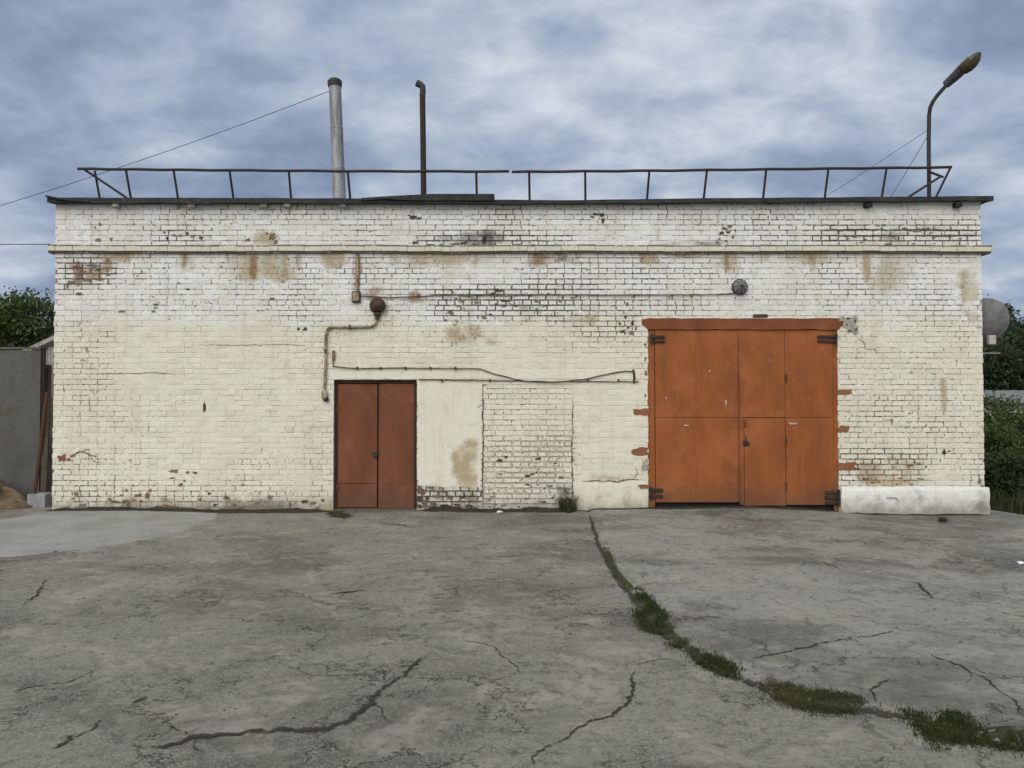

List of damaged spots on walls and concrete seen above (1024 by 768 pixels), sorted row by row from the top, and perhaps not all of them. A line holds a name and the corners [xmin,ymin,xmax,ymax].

water stain [242,233,287,280]
water stain [452,440,477,487]
crack [531,515,935,768]
crack [153,657,424,751]
crack [922,650,1021,715]